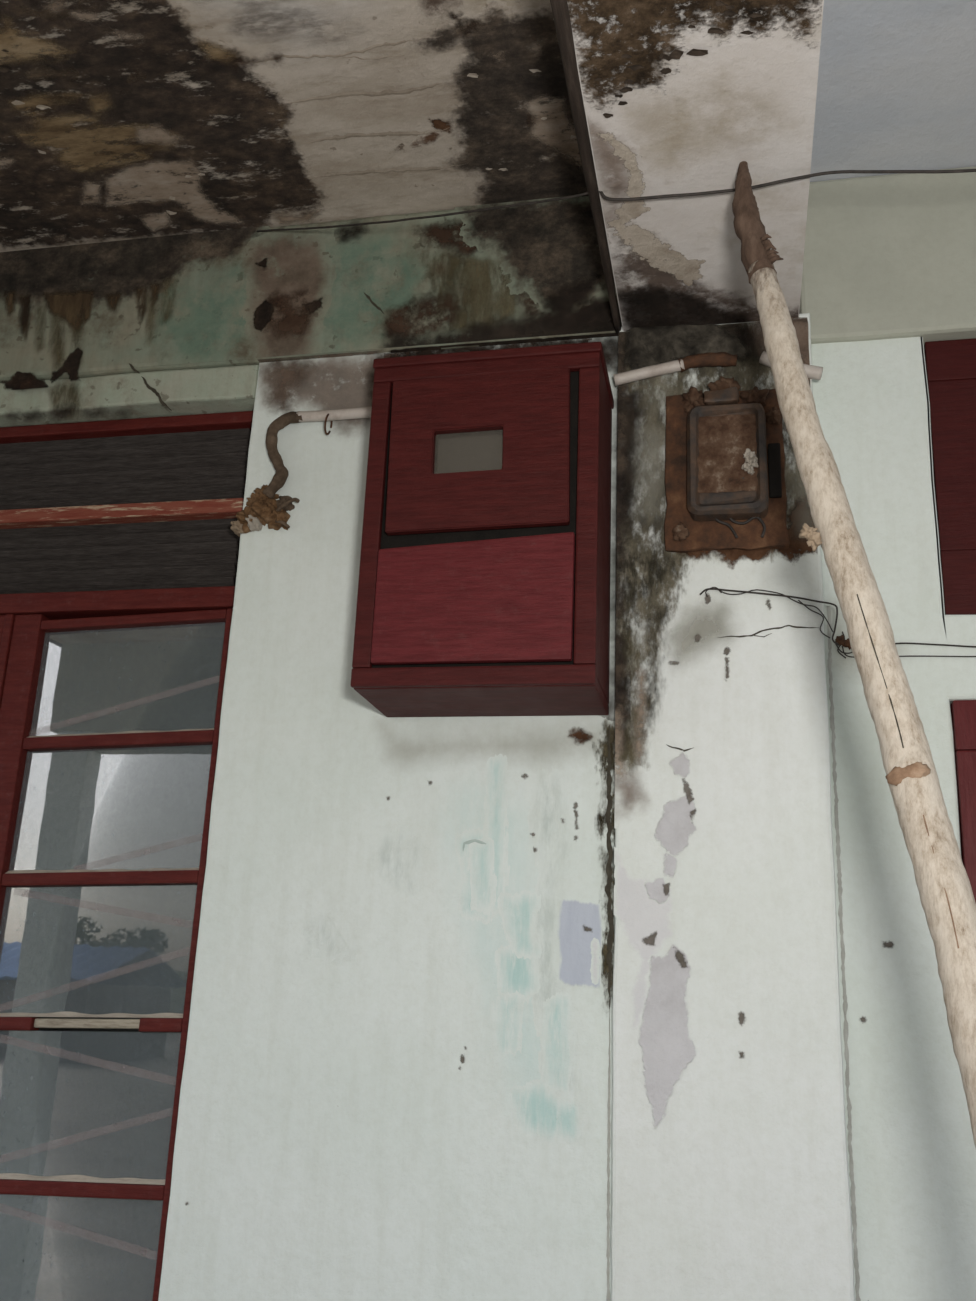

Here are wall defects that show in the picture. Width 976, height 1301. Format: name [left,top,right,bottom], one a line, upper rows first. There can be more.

water stain [0,0,823,443]
spalling [2,348,83,390]
crack [129,363,172,411]
water stain [468,313,783,829]
corrosion [682,376,781,493]
corrosion [672,495,818,566]
water stain [783,420,806,529]
peeling [557,750,698,1129]